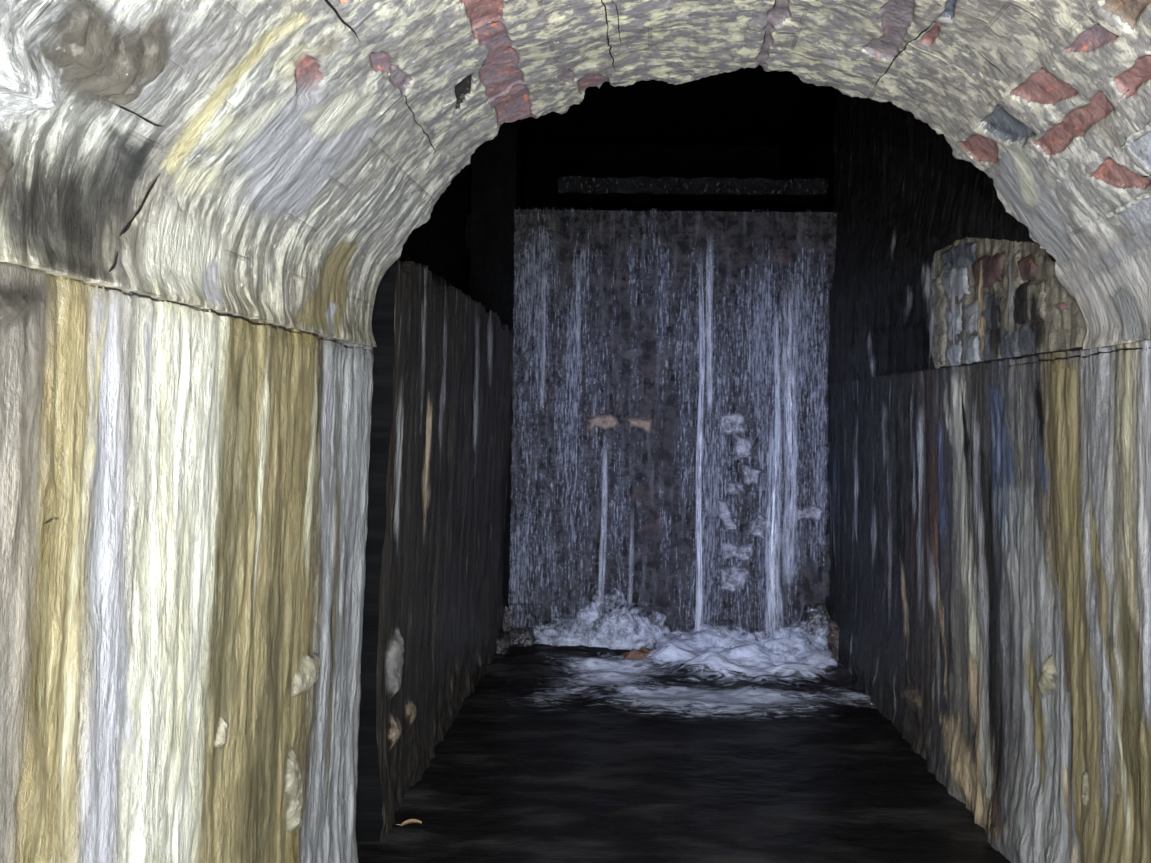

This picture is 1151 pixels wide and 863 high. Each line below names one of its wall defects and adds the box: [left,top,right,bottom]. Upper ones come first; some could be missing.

water stain [167,14,375,216]
crack [325,0,360,41]
spalling [453,0,535,129]
spalling [862,0,915,61]
spalling [958,55,1151,164]
spalling [1065,0,1151,53]
water stain [6,134,148,279]
water stain [139,205,226,305]
crack [51,174,372,352]
crack [1000,347,1151,367]
water stain [0,240,374,863]
water stain [871,361,1151,863]